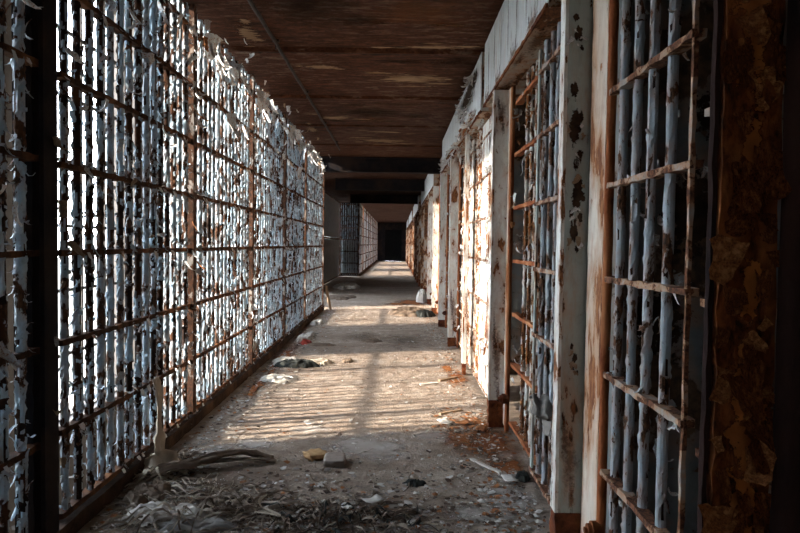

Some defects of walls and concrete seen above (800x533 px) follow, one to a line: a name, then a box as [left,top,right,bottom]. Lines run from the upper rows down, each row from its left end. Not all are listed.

peeling [566,13,588,50]
peeling [157,0,348,180]
peeling [567,109,587,253]
peeling [55,200,68,219]
peeling [65,240,85,258]
peeling [186,245,207,278]
peeling [179,304,204,384]